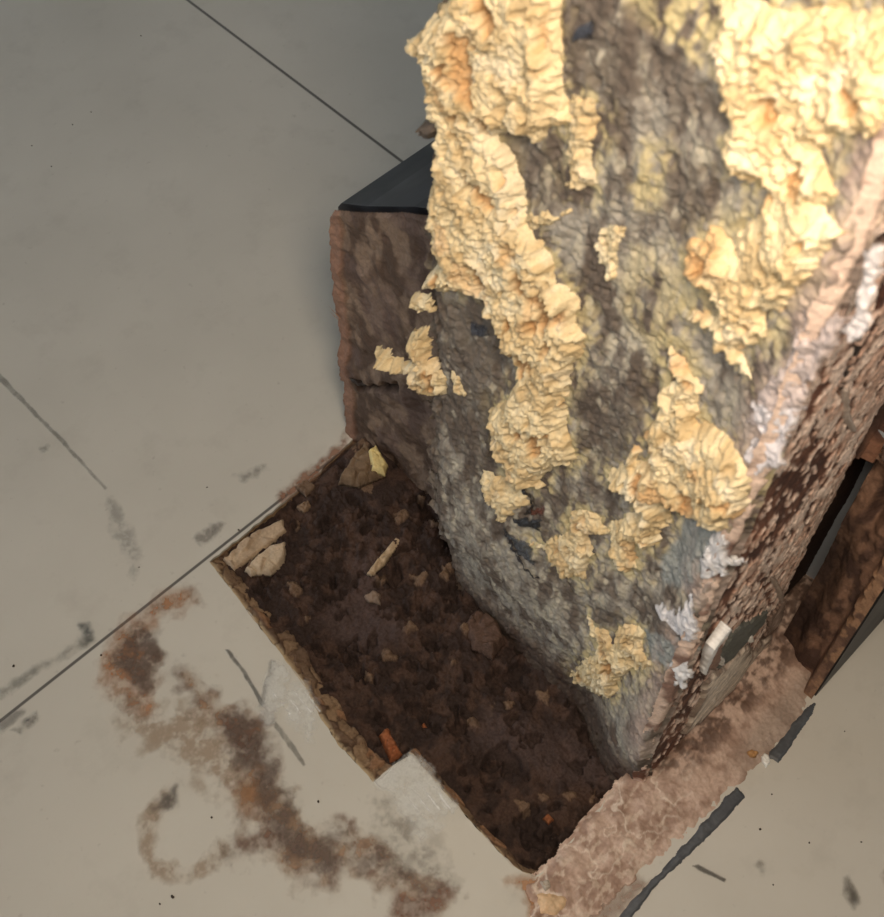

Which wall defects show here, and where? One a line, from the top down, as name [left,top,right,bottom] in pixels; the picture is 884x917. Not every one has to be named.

spalling [424,0,884,782]
crack [837,329,868,390]
rust [103,592,190,714]
rust [180,672,452,917]
spalling [210,555,537,877]